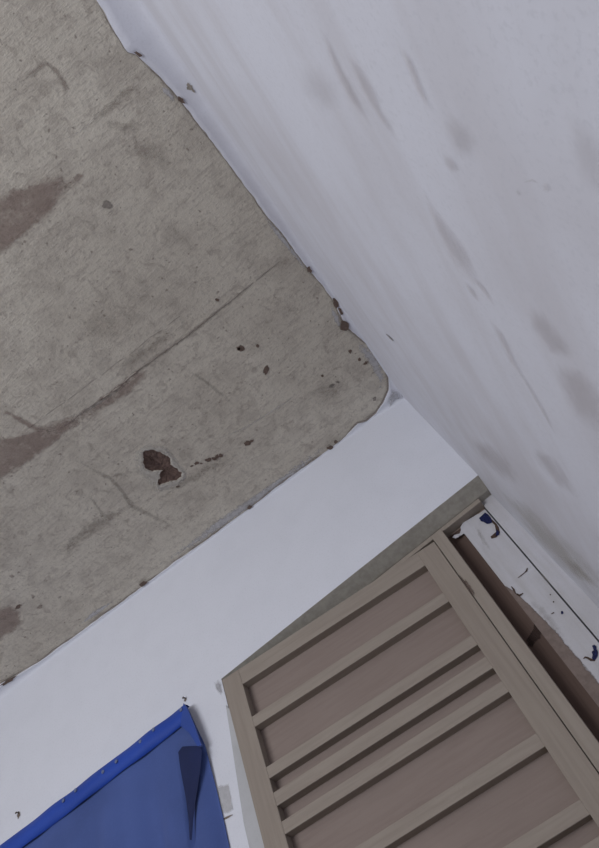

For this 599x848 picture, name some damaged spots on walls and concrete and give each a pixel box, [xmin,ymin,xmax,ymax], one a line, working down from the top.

peeling [333,298,349,331]
spalling [139,449,185,489]
peeling [453,512,500,550]
peeling [505,586,599,707]